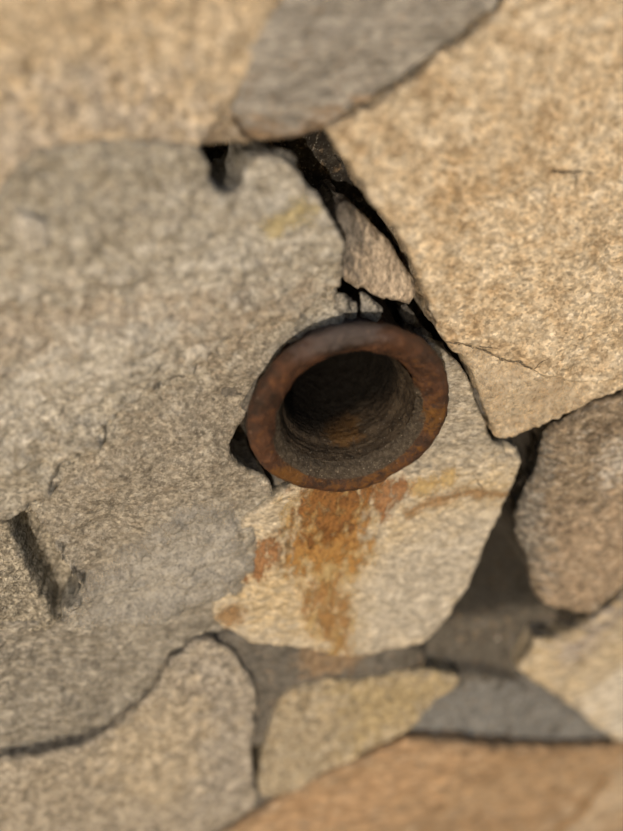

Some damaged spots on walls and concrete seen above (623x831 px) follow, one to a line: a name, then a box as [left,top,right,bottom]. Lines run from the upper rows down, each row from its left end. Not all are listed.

crack [449,342,549,376]
rust [243,469,454,656]